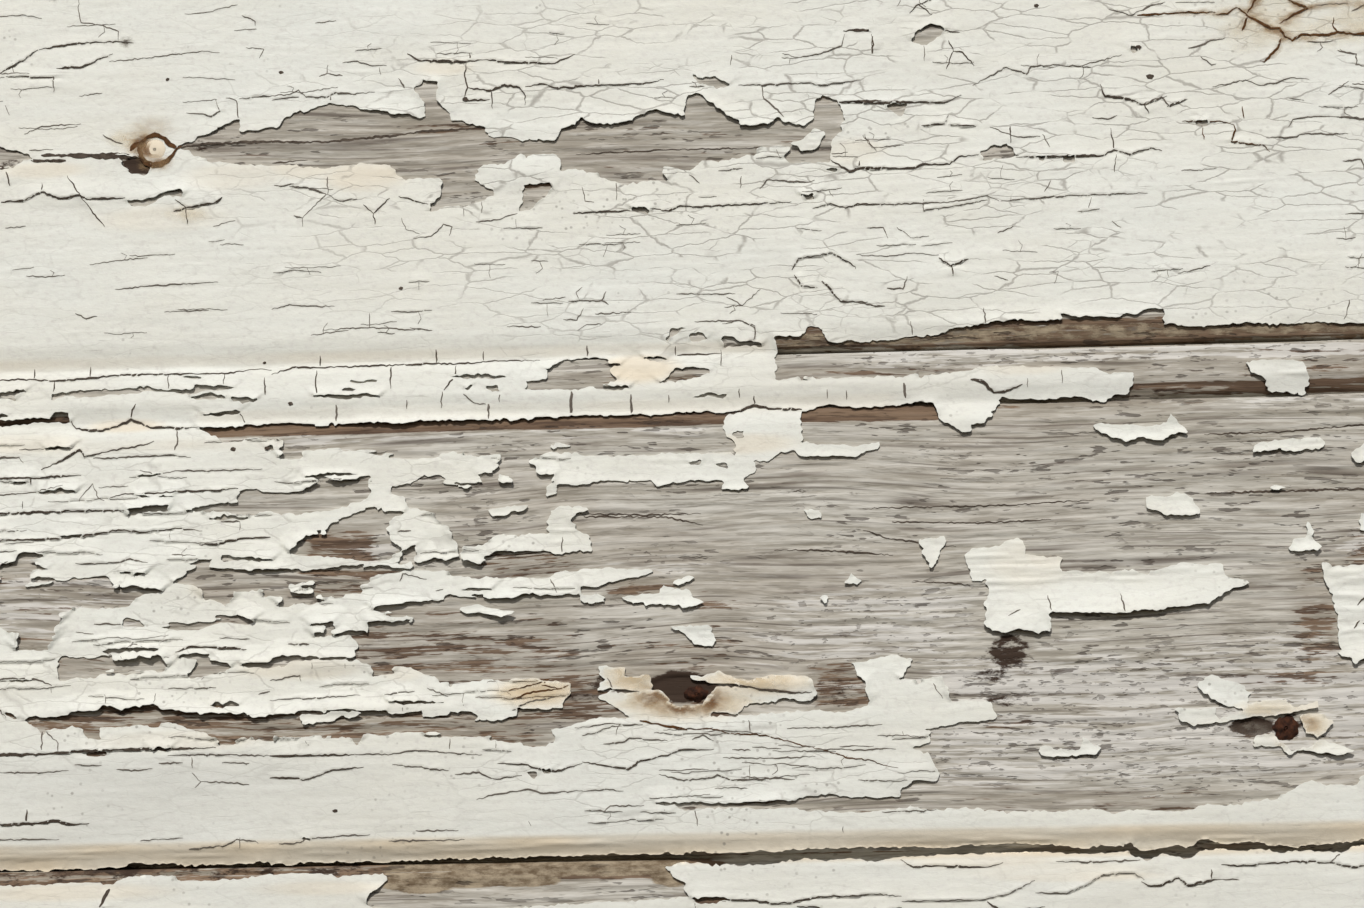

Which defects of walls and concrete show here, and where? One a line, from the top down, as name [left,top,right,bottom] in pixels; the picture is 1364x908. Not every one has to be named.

corrosion [134,135,164,165]
peeling [178,75,845,212]
crack [0,0,700,356]
crack [575,0,1364,363]
crack [725,389,847,415]
crack [971,378,1028,393]
peeling [0,308,1364,814]
corrosion [513,687,556,699]
corrosion [648,692,719,713]
crack [99,889,110,908]
peeling [363,866,730,908]
crack [695,854,1364,908]